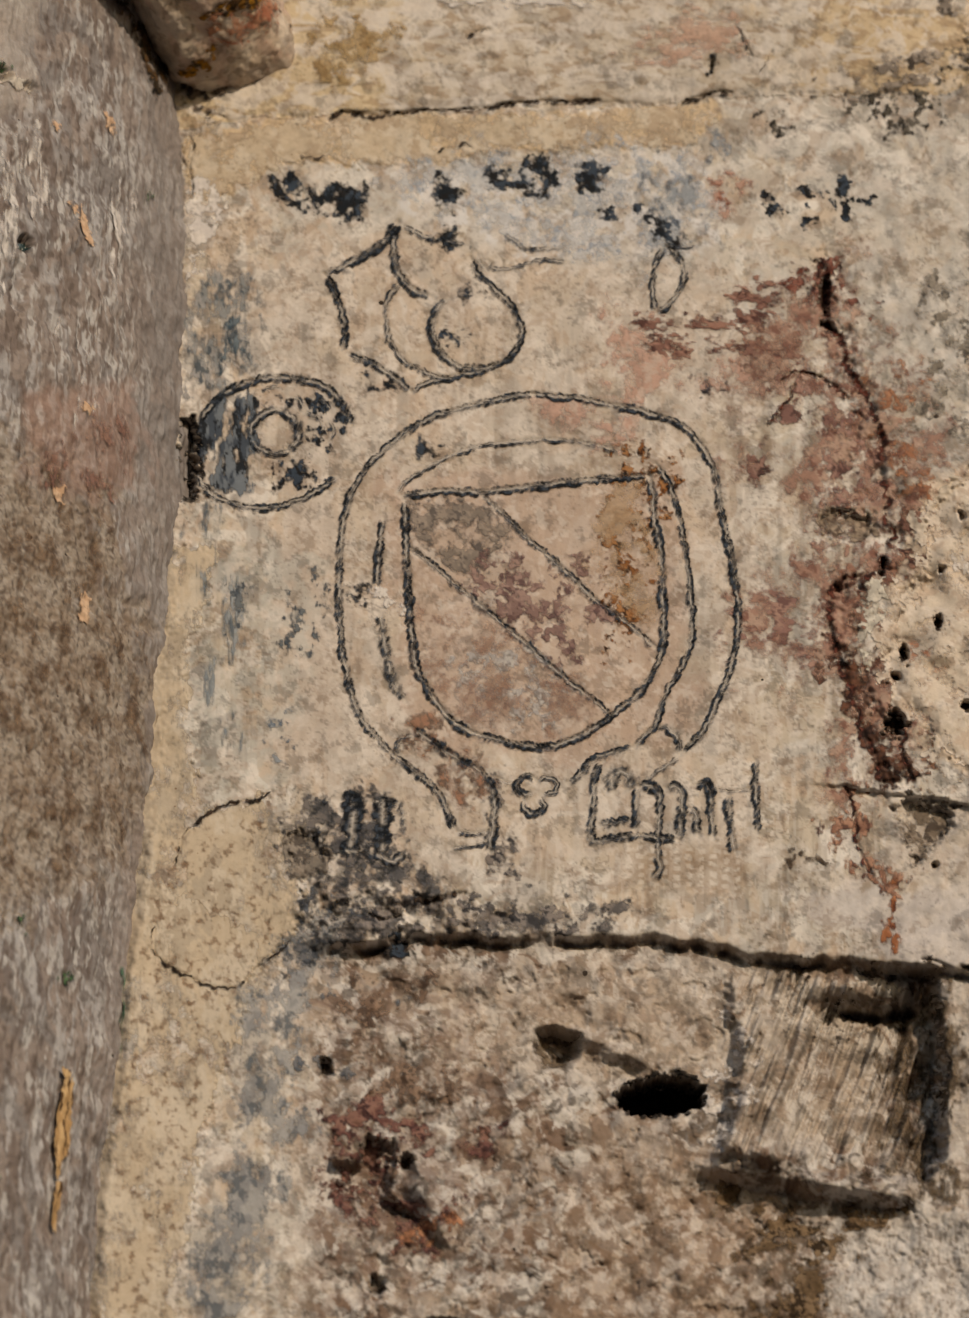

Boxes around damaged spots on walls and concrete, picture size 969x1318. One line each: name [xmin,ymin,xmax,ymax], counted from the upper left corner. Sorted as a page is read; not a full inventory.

crack [330,99,597,152]
crack [682,90,730,104]
crack [768,261,914,874]
crack [175,791,270,863]
crack [151,927,291,990]